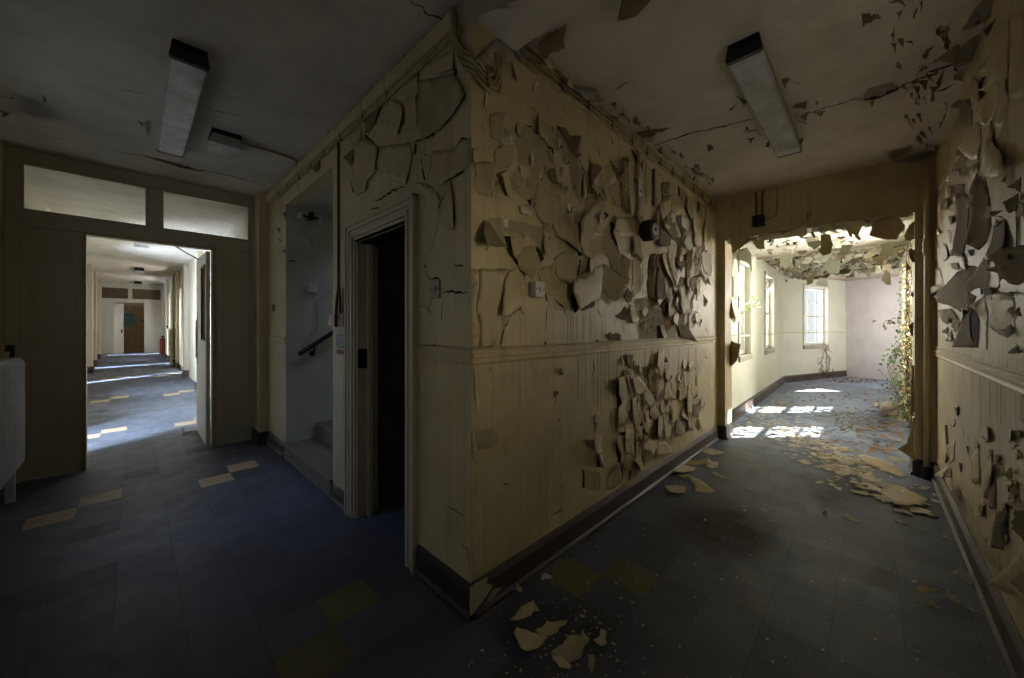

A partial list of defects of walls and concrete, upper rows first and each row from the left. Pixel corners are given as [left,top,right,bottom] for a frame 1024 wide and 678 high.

peeling [539,24,567,69]
peeling [617,0,650,22]
peeling [860,13,881,28]
peeling [470,78,715,349]
crack [654,118,754,146]
crack [795,73,939,118]
peeling [888,0,1024,354]
peeling [726,212,916,323]
peeling [731,341,741,366]
peeling [582,351,709,491]
peeling [898,365,916,461]
peeling [935,406,1024,600]